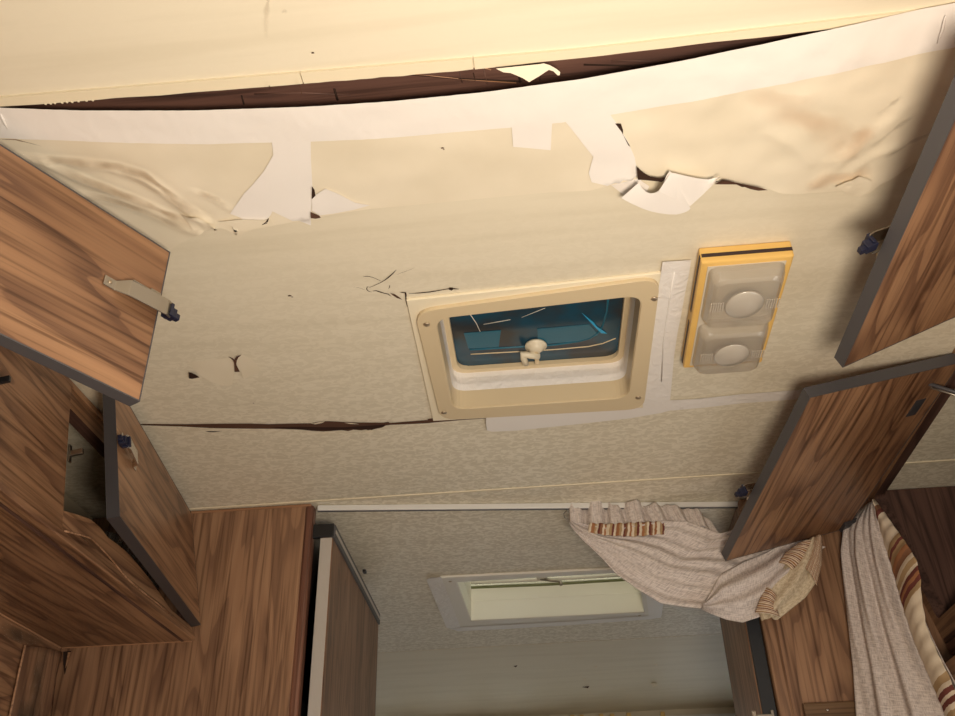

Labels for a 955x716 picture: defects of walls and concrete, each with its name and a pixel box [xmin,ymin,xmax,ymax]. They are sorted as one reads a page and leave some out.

peeling [496,63,560,82]
crack [357,269,456,304]
crack [141,418,485,433]